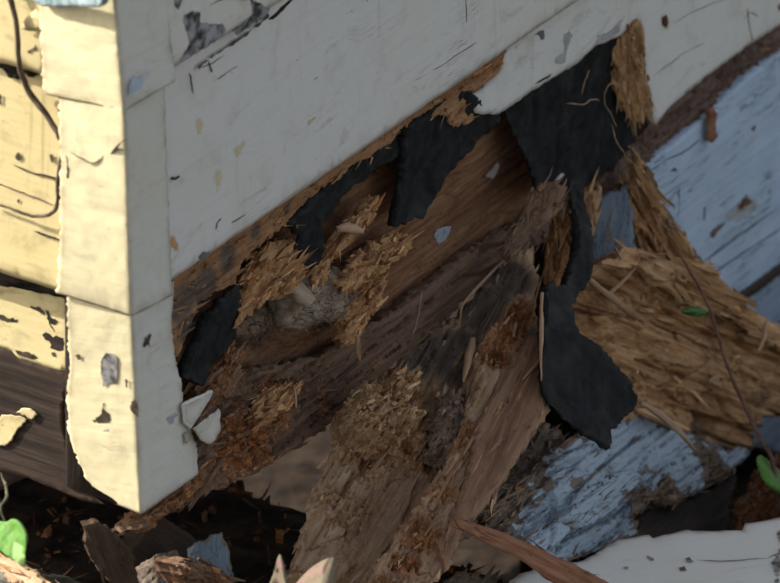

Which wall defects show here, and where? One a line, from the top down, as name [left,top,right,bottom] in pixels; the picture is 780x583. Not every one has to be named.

peeling [174,0,270,69]
peeling [100,353,128,387]
peeling [0,347,106,505]
peeling [93,403,110,423]
peeling [182,390,221,445]
spalling [605,432,743,547]
peeling [771,549,780,582]